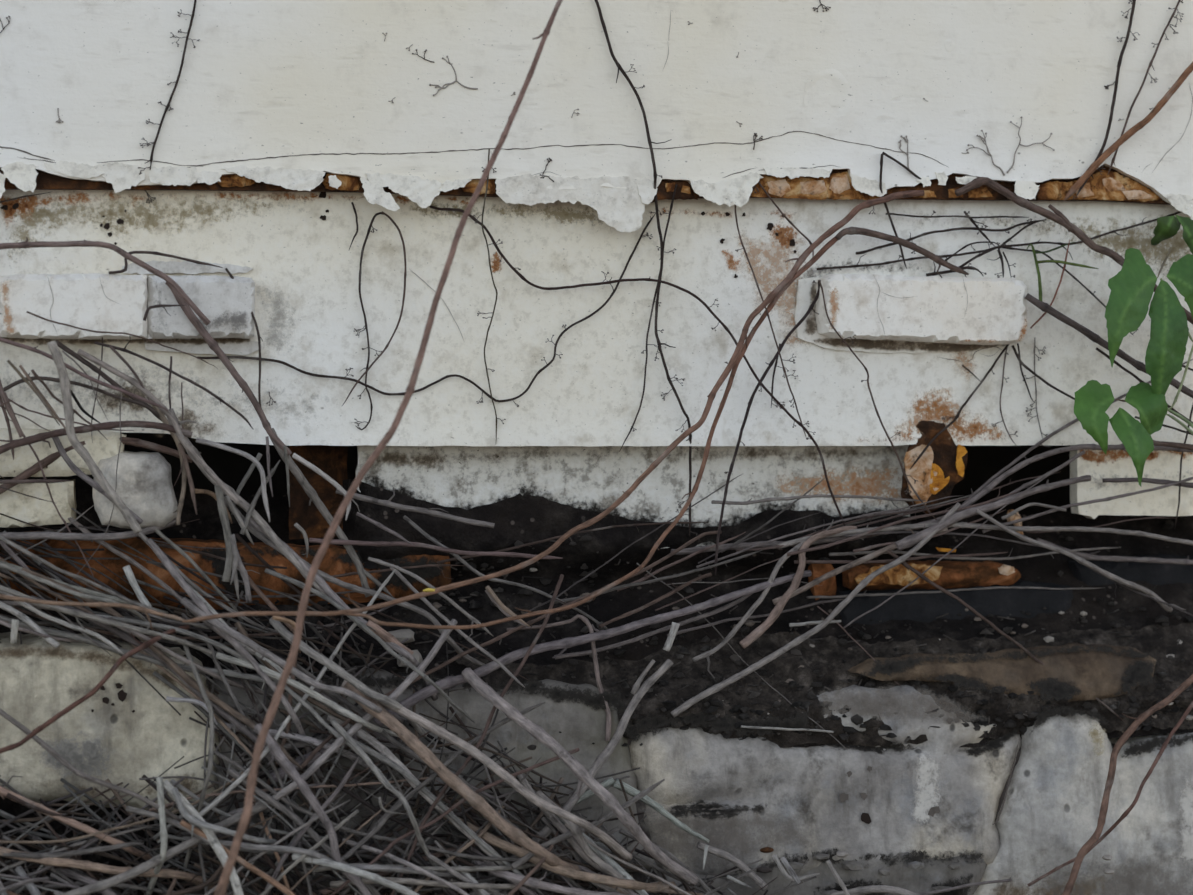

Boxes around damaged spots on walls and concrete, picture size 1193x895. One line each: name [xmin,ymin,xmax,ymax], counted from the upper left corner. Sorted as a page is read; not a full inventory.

peeling [0,160,342,198]
peeling [360,172,472,211]
peeling [495,173,658,232]
peeling [690,166,830,207]
peeling [850,173,887,197]
corrosion [750,171,1015,201]
peeling [916,172,977,187]
peeling [1014,180,1040,200]
corrosion [722,212,799,343]
corrosion [830,288,839,327]
corrosion [778,390,1002,514]
corrosion [842,560,1021,592]